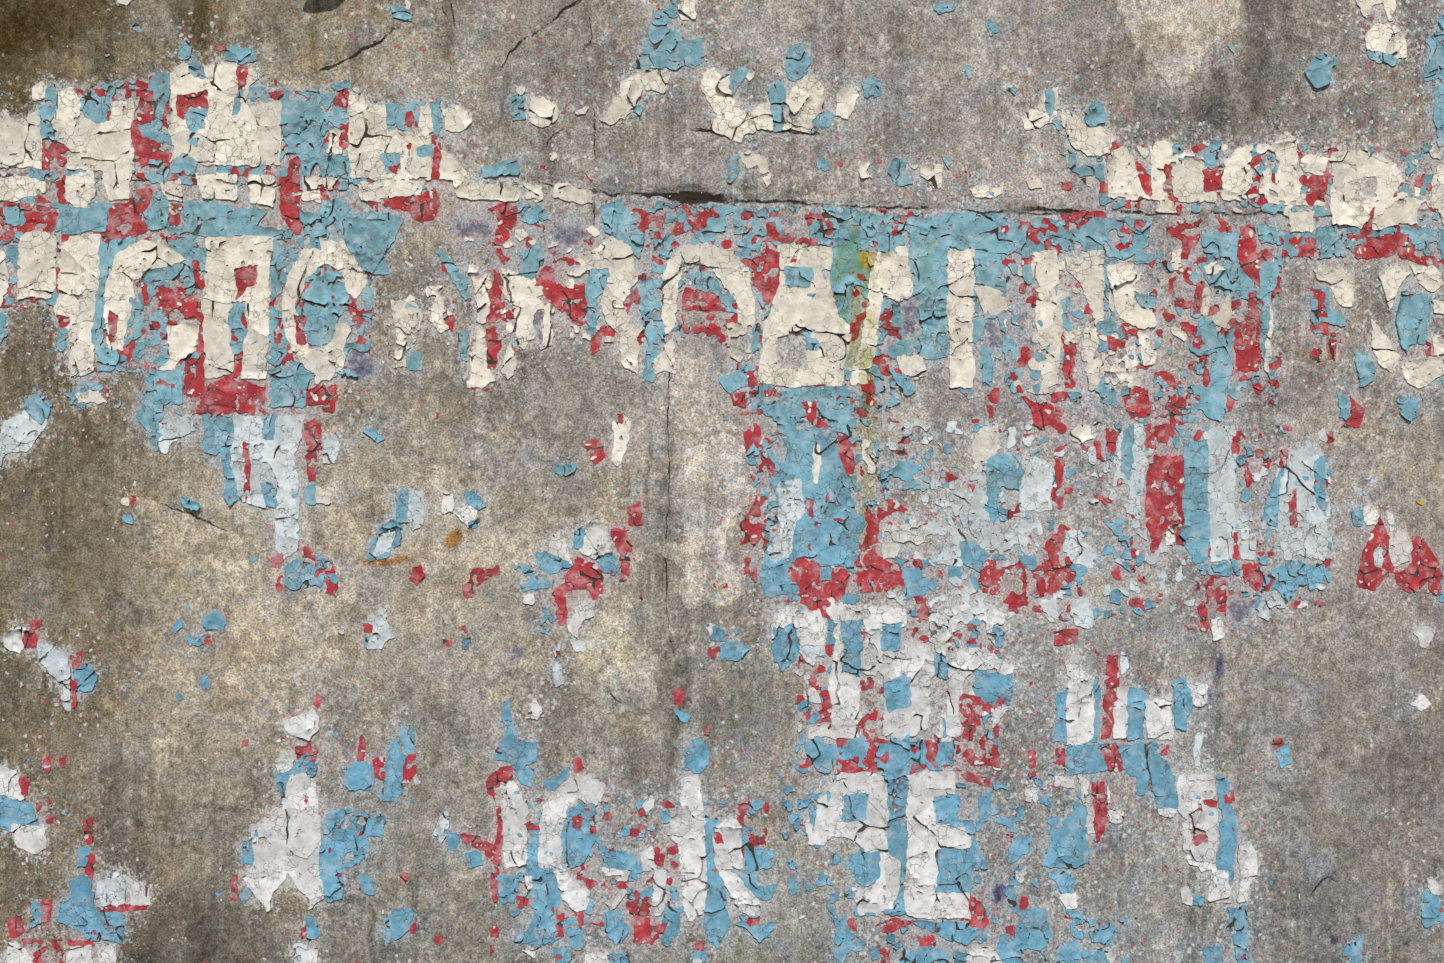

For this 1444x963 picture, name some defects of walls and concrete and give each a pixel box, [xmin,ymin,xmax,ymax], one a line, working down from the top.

peeling [1287,24,1346,97]
peeling [857,156,952,198]
peeling [964,170,1003,201]
peeling [356,476,486,561]
peeling [408,563,434,585]
spalling [456,484,694,723]
peeling [1351,493,1444,610]
peeling [1413,625,1435,648]
peeling [1272,738,1292,779]
peeling [0,749,151,963]
peeling [1421,864,1444,928]
peeling [382,907,443,954]